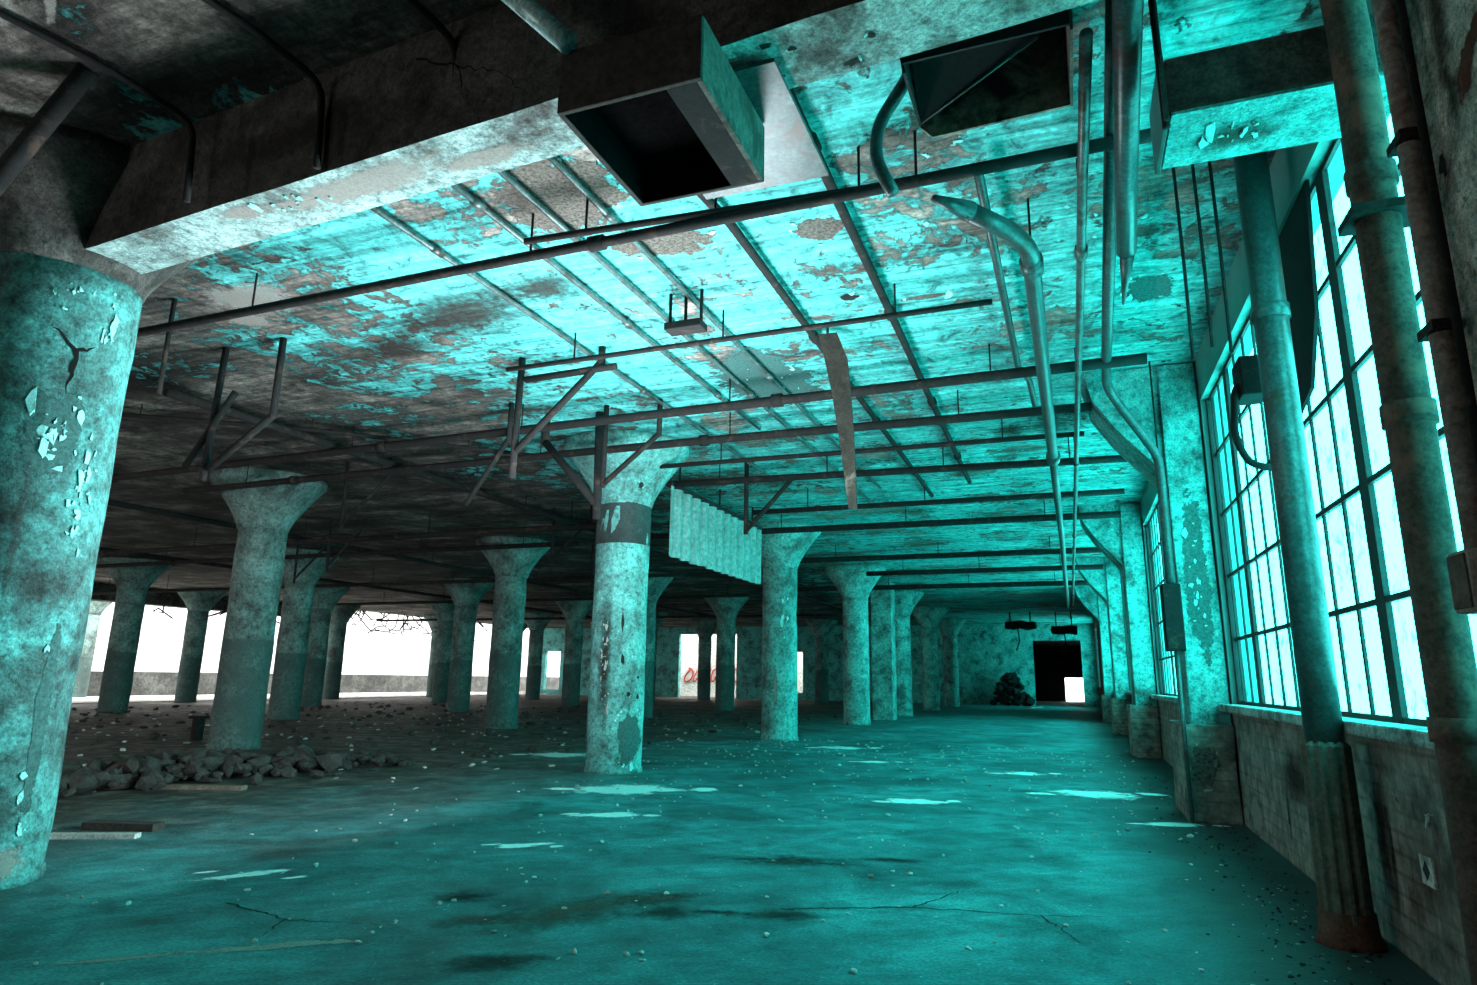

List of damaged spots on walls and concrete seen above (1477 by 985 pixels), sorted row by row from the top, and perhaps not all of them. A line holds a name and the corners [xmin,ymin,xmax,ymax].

crack [53,327,95,390]
peeling [20,387,98,557]